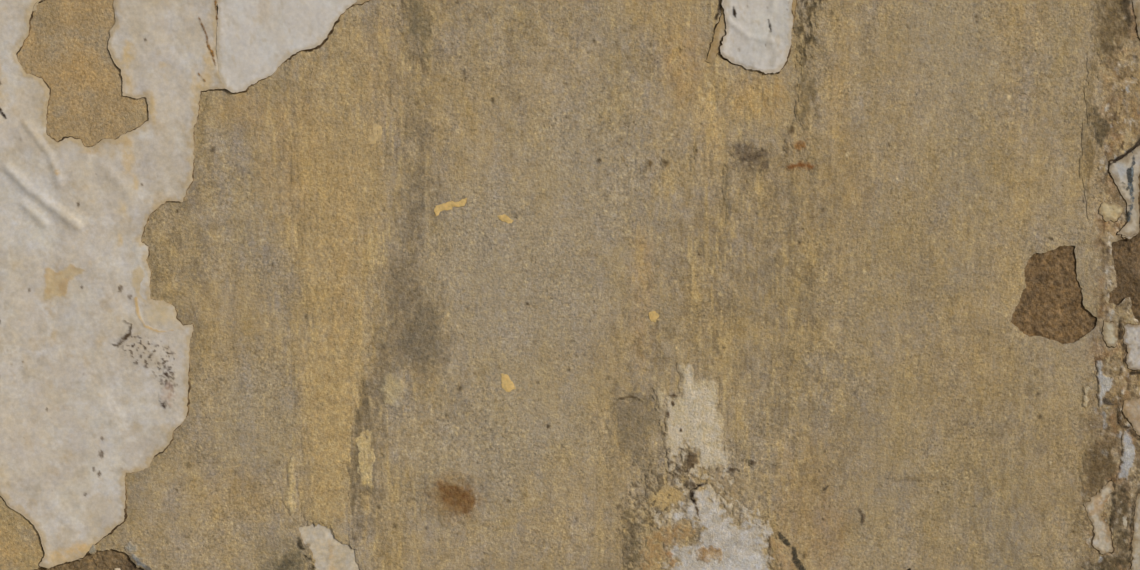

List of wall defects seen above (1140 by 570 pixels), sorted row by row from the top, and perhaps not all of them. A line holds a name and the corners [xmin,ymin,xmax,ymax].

peeling [705,0,798,75]
peeling [1132,0,1140,40]
peeling [434,196,468,216]
peeling [0,0,370,570]
spalling [1011,146,1140,371]
peeling [375,371,410,410]
peeling [501,373,516,392]
peeling [1121,396,1140,437]
rust [416,466,492,530]
peeling [1083,479,1140,570]